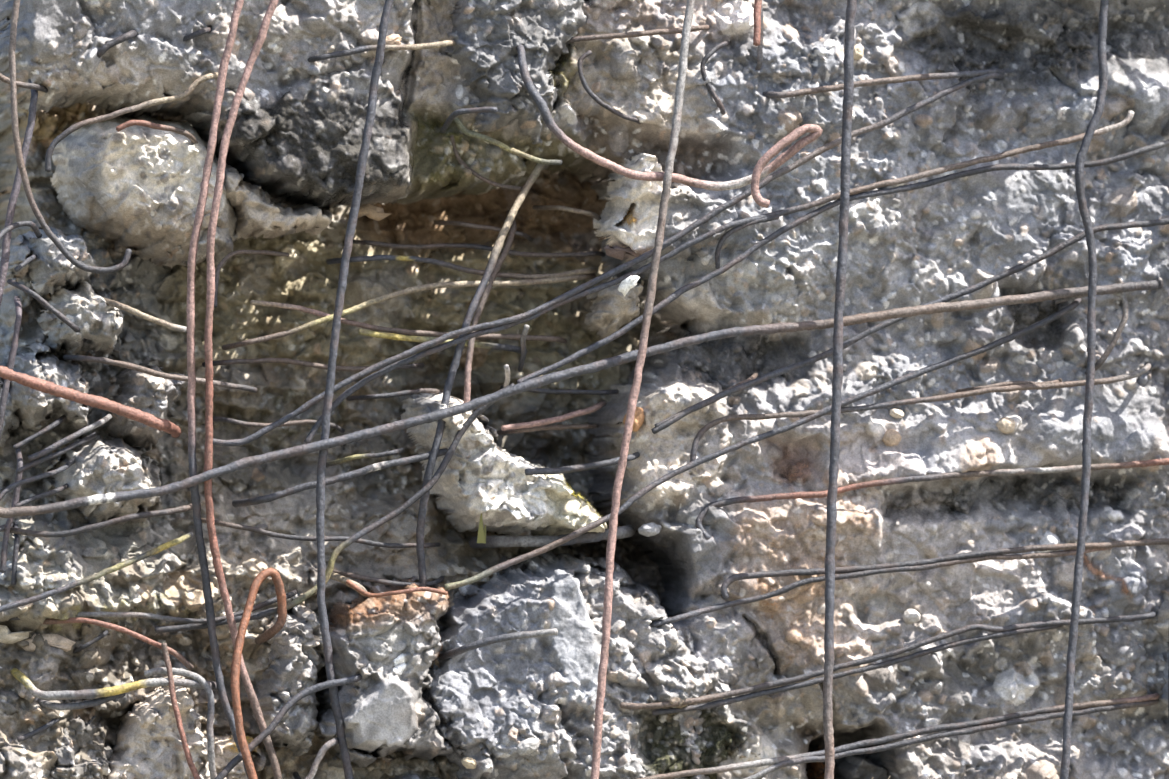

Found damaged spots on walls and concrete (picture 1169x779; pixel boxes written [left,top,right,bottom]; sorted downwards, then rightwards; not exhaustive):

spalling [0,0,642,779]
crack [394,0,430,126]
spalling [516,0,1163,779]